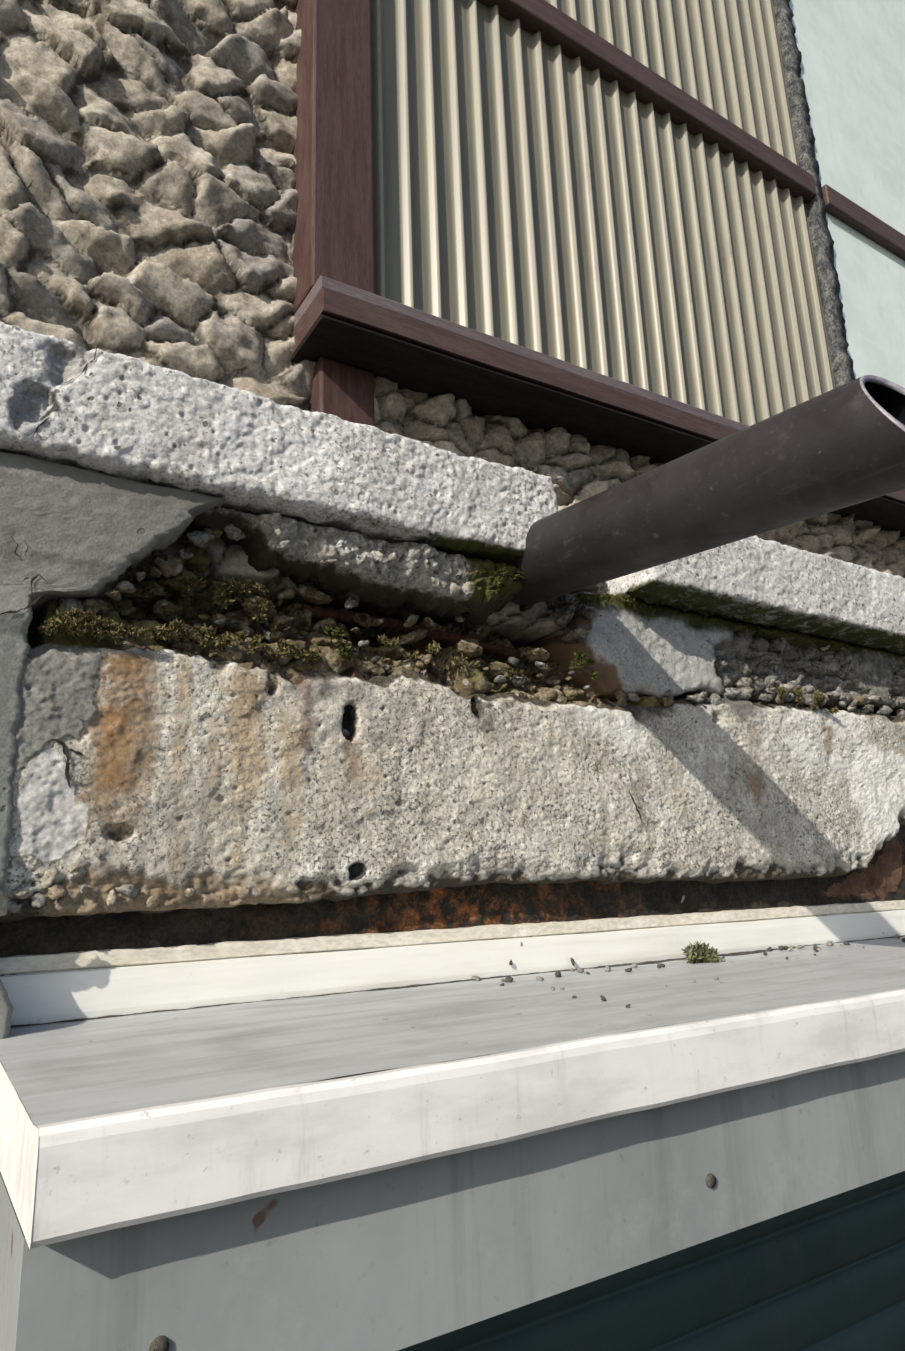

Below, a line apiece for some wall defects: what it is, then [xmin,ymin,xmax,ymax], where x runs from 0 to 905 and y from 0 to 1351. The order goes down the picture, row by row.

crack [33,344,99,436]
spalling [13,506,905,770]
corrosion [93,651,154,800]
spalling [821,820,905,902]